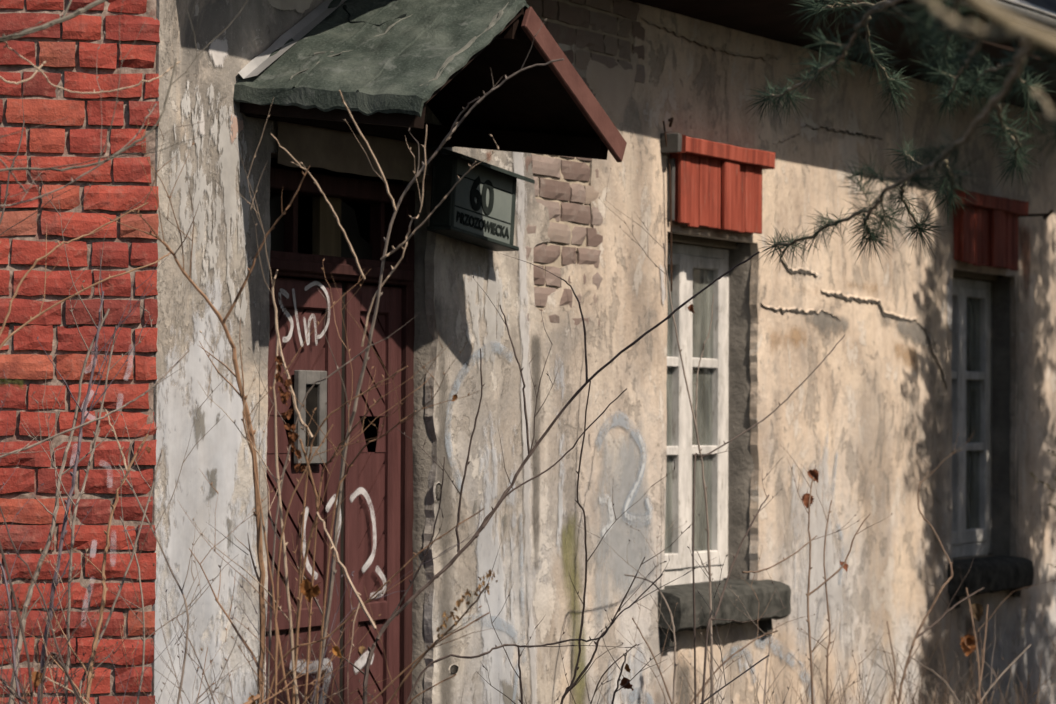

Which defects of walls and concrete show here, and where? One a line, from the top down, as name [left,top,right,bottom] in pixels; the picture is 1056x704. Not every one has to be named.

flaking render [525,0,645,97]
crack [773,123,883,144]
crack [762,258,947,389]
flaking render [464,152,603,704]